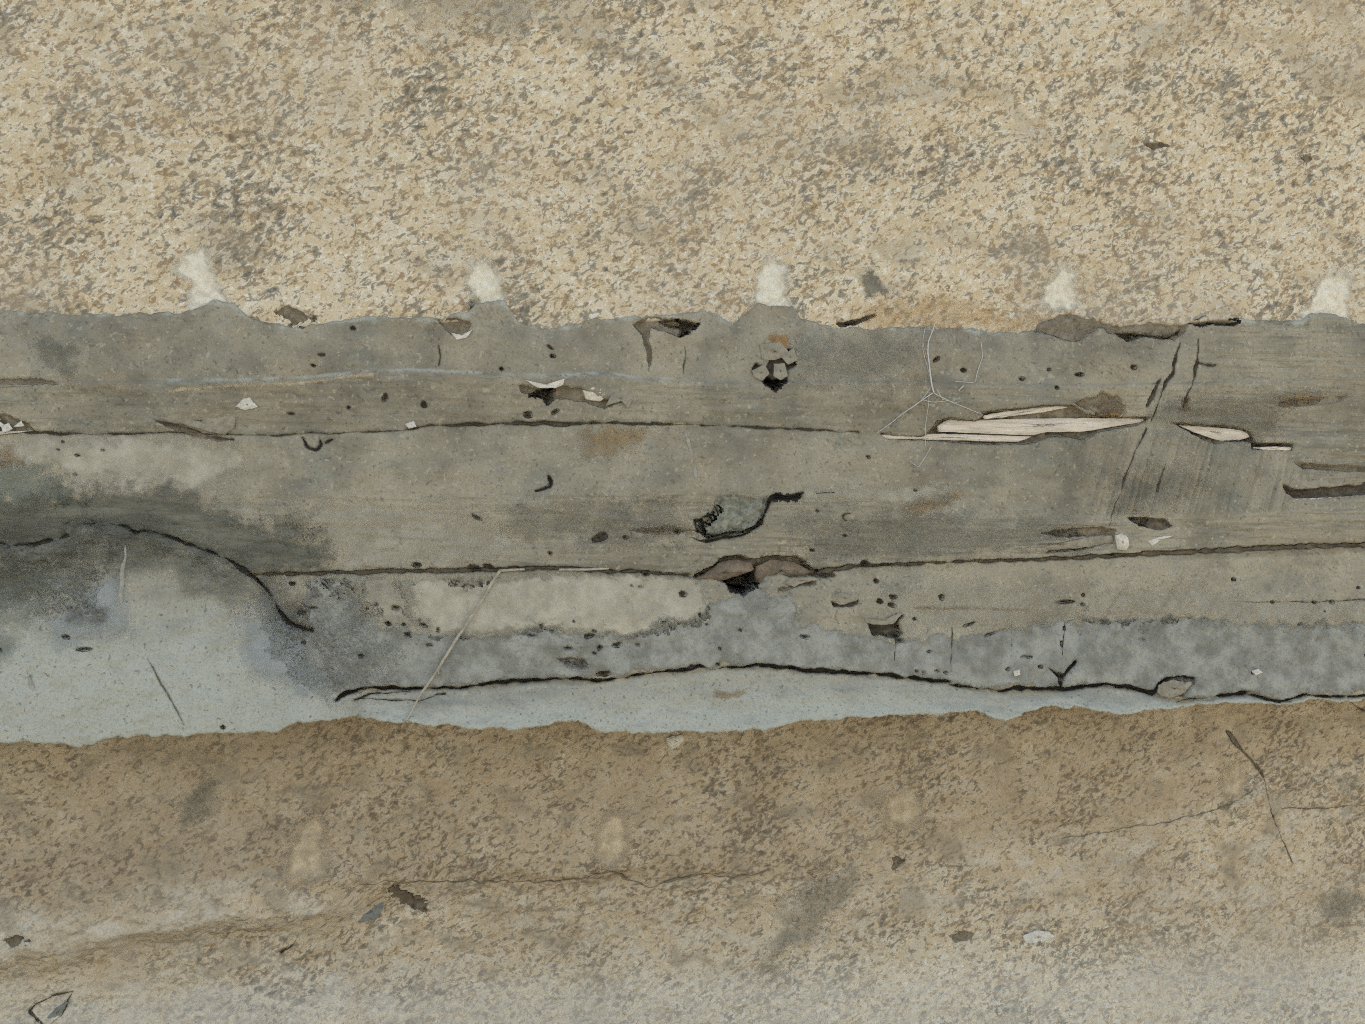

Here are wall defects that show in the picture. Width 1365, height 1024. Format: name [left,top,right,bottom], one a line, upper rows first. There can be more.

spalling [752,342,798,393]
spalling [882,391,1151,445]
crack [817,339,1365,573]
spalling [623,492,799,540]
crack [694,492,850,543]
crack [0,522,688,630]
spalling [693,549,835,598]
spalling [832,592,917,643]
crack [335,621,1365,711]
crack [1062,730,1365,863]